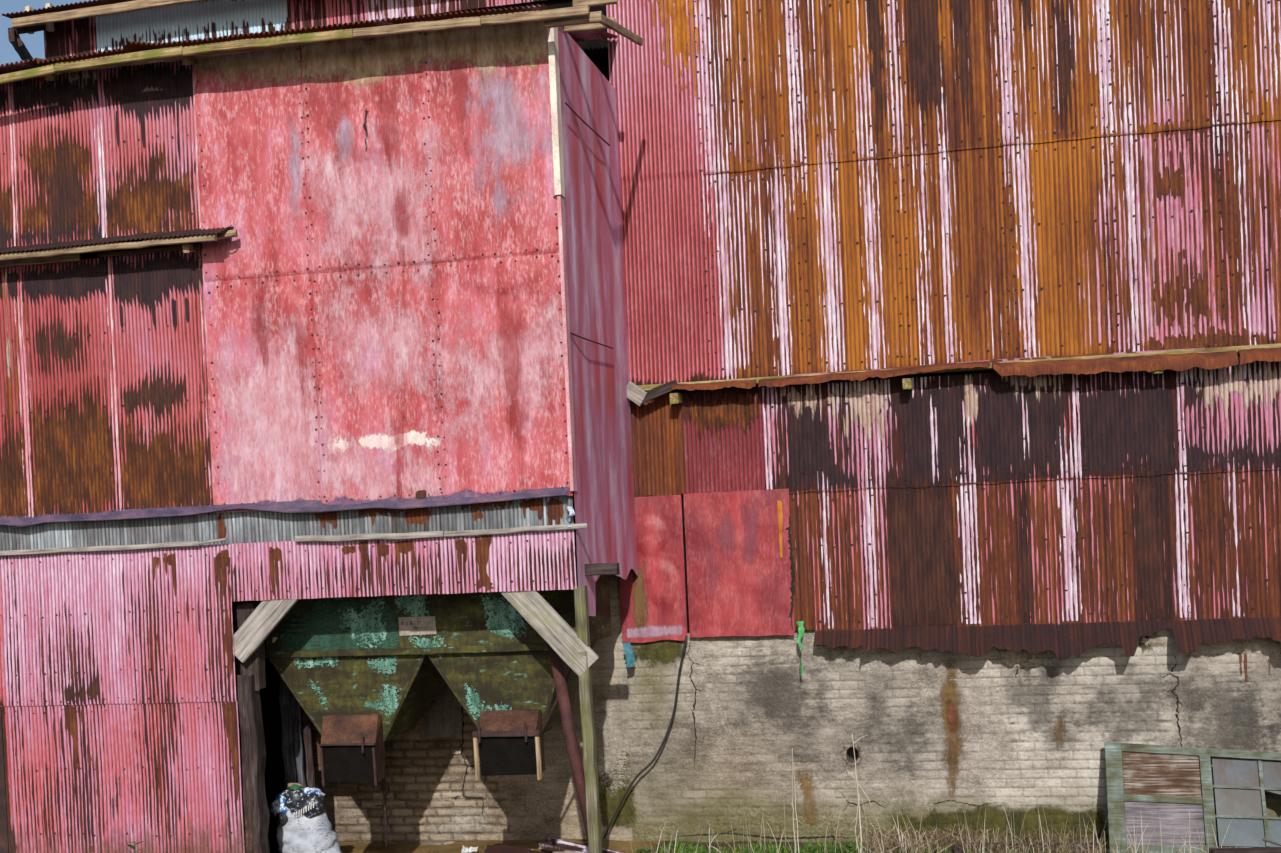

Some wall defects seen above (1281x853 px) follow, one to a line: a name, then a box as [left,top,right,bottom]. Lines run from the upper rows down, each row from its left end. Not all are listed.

leakage [196,21,548,86]
rust [866,0,887,143]
rust [1051,0,1076,136]
rust [1150,247,1247,351]
rust [0,60,234,676]
peeling [327,429,441,456]
rust [455,497,564,590]
rust [883,373,1281,626]
peeling [280,594,446,717]
peeling [480,593,526,638]
leakage [1054,719,1063,745]
crack [1162,655,1183,747]